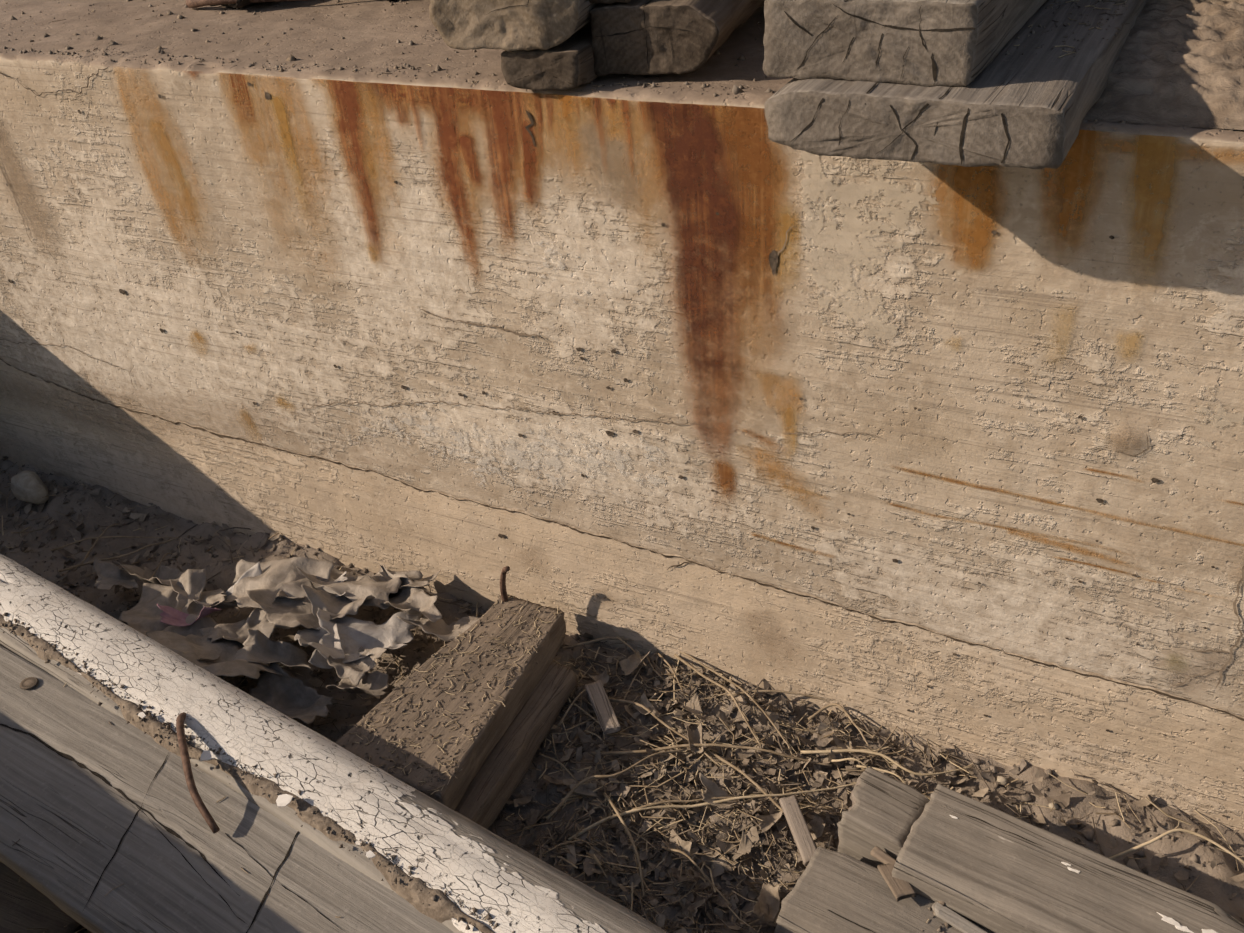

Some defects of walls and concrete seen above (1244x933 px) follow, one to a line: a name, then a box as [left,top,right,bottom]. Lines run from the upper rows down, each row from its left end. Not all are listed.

rust [116,71,187,238]
rust [313,79,798,443]
rust [934,164,1004,268]
rust [1042,129,1244,267]
crack [0,339,1244,721]
rust [715,462,734,495]
rust [982,523,1126,573]